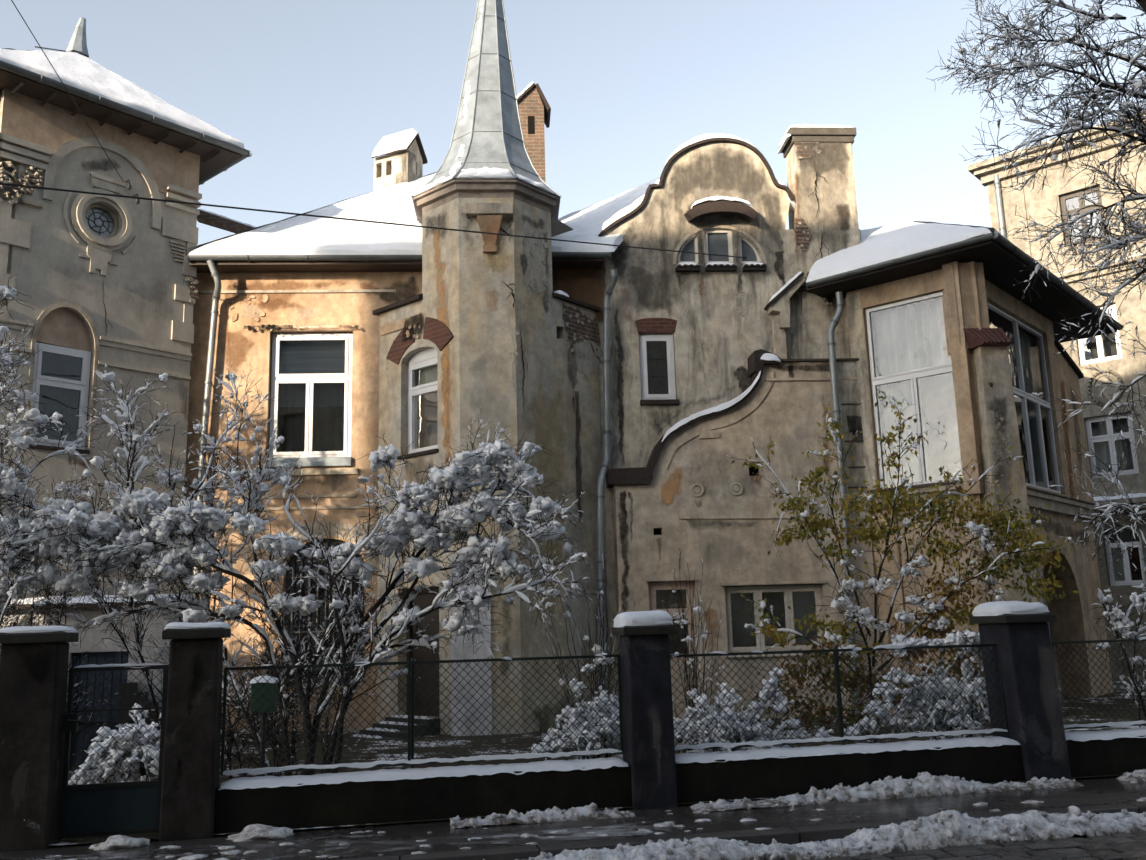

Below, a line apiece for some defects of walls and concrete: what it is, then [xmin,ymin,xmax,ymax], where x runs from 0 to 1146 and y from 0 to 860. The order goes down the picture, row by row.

flaking render [521,231,549,312]
flaking render [793,218,812,252]
crack [808,168,829,258]
crack [502,281,528,414]
flaking render [562,303,601,379]
water stain [531,354,582,520]
peeling [662,469,681,505]